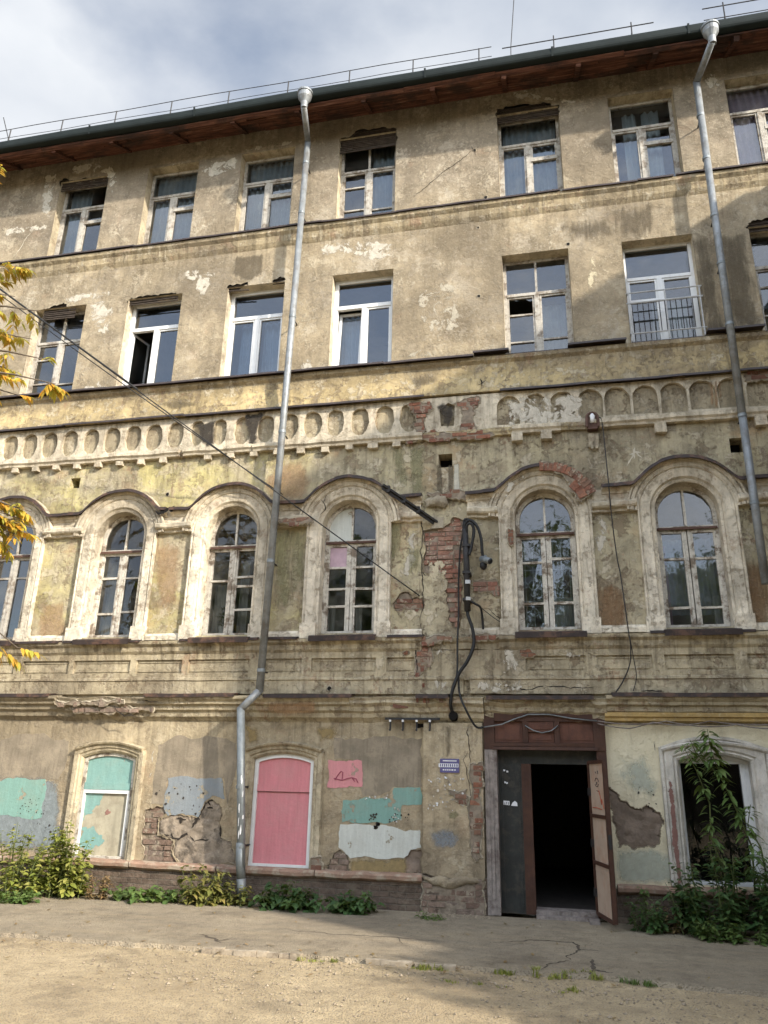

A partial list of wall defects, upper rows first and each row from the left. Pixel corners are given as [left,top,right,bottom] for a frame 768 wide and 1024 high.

peeling [202,145,268,177]
peeling [322,241,391,260]
peeling [185,270,215,295]
flaking render [405,396,495,444]
peeling [508,395,582,426]
flaking render [538,461,596,503]
crack [414,505,425,676]
flaking render [390,516,503,709]
flaking render [53,698,155,716]
peeling [140,735,237,865]
flaking render [609,782,681,884]